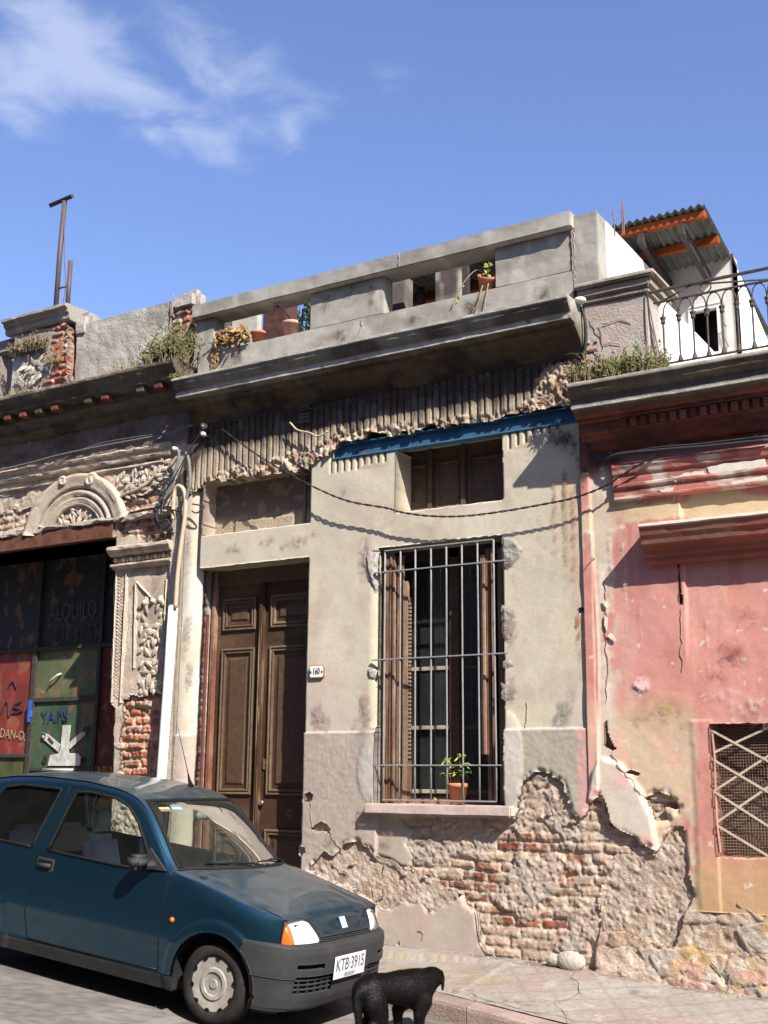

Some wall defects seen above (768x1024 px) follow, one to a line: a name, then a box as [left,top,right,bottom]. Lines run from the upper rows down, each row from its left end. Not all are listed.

spalling [38,322,74,387]
spalling [519,359,572,414]
peeling [658,459,767,492]
spalling [0,487,172,541]
crack [602,581,610,701]
crack [677,595,685,667]
spalling [115,688,163,777]
crack [607,730,647,798]
spalling [312,772,695,970]